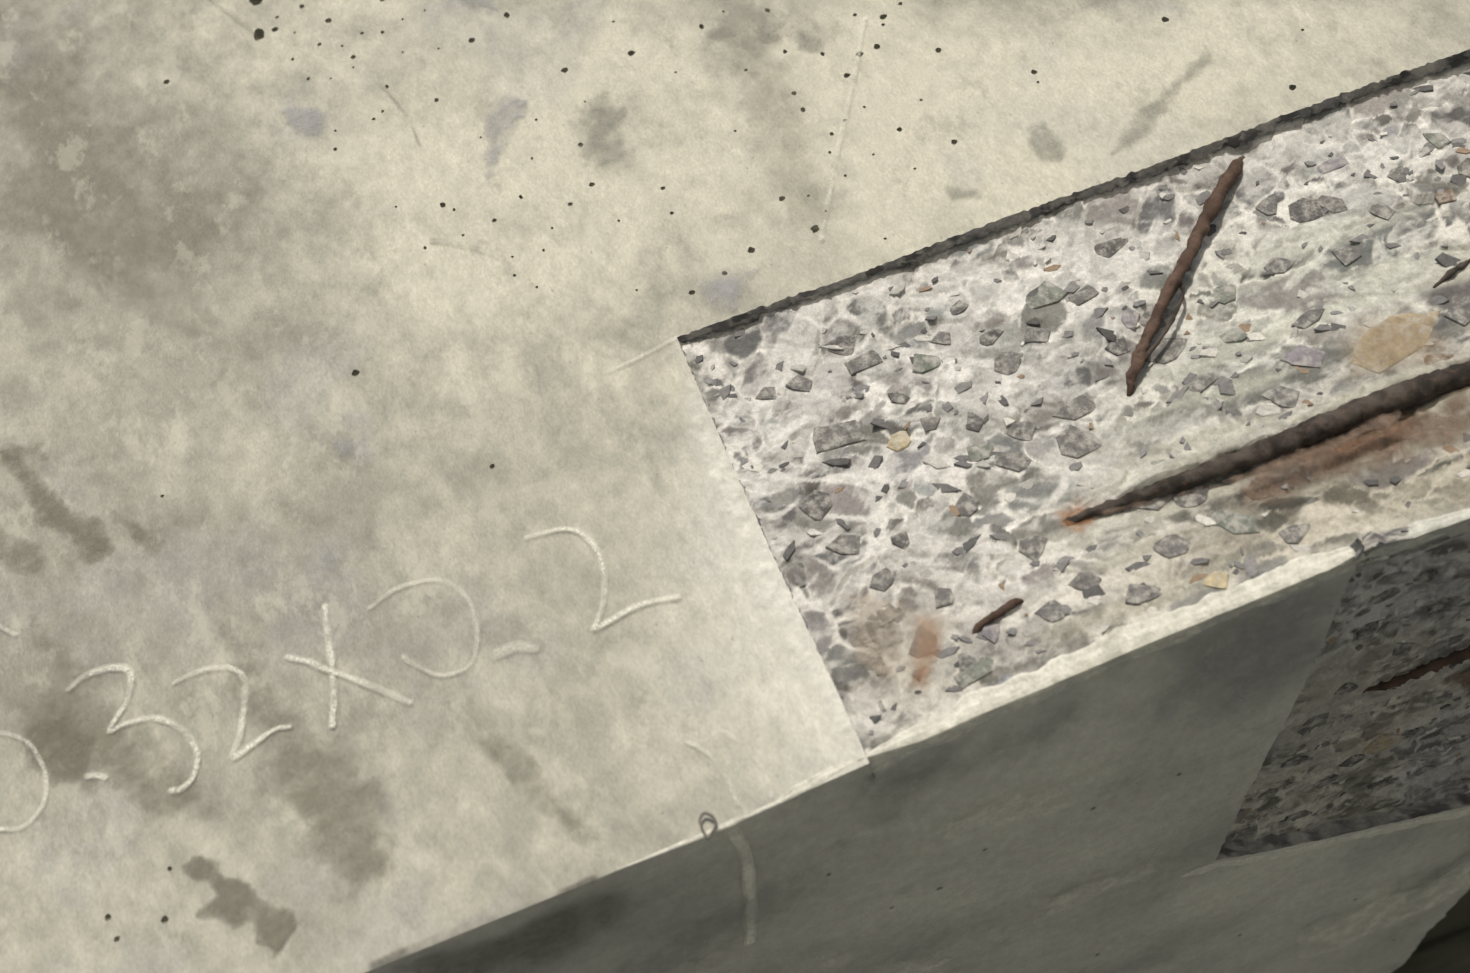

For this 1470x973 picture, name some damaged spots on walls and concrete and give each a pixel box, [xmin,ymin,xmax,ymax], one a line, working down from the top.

spalling [603,49,1470,878]
corrosion [1241,394,1470,504]